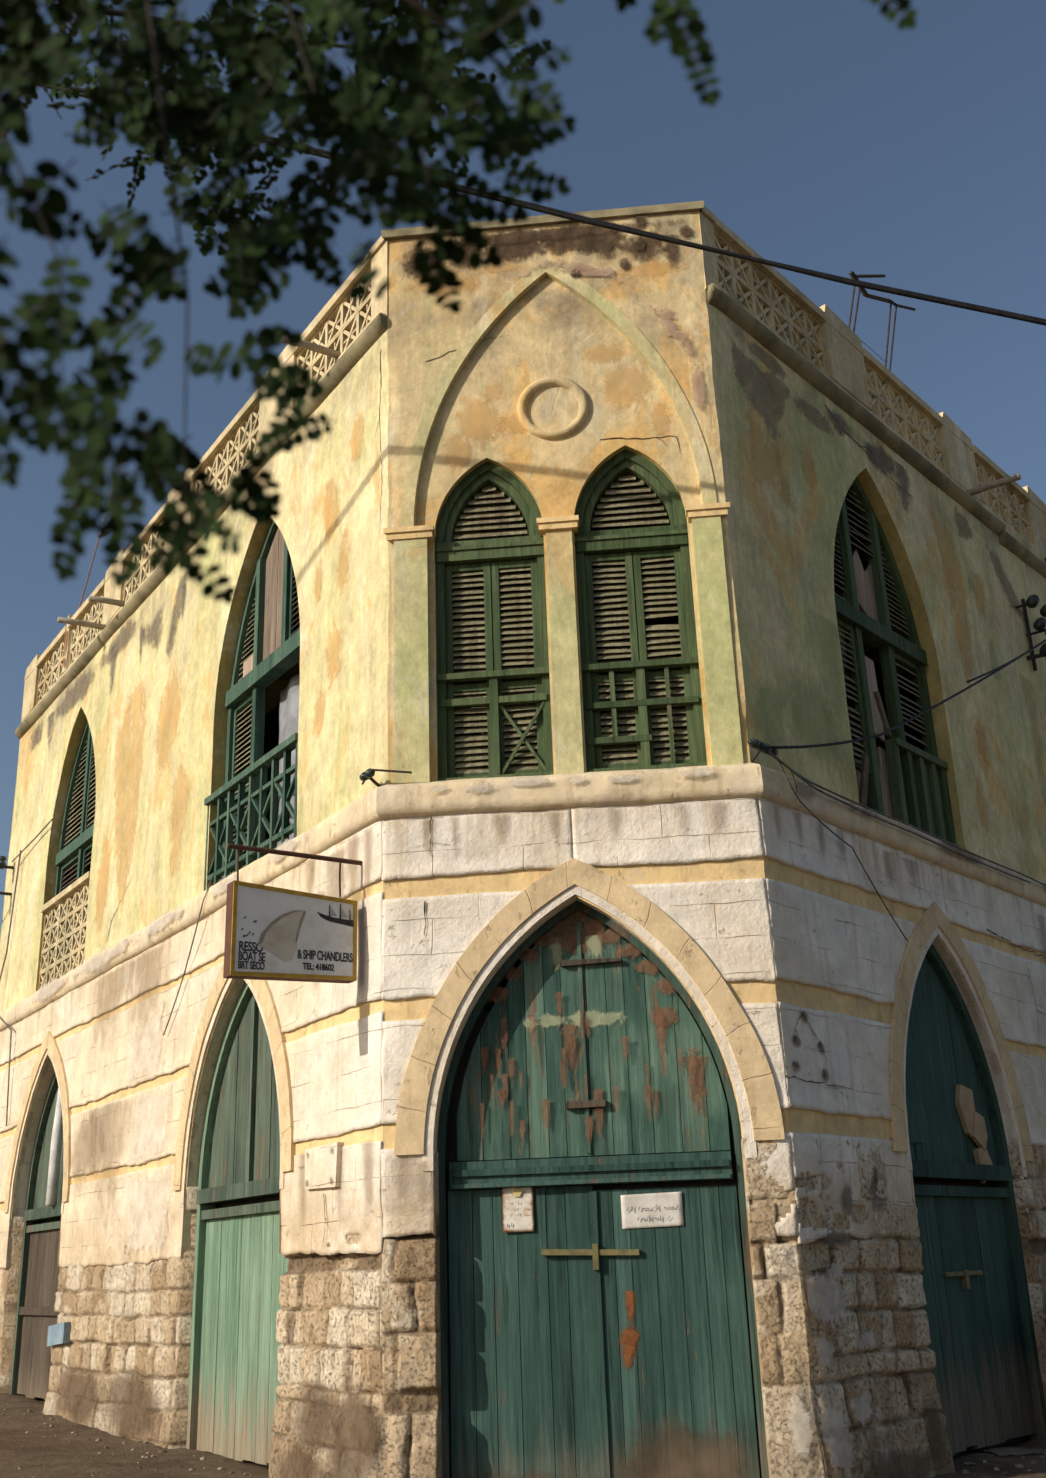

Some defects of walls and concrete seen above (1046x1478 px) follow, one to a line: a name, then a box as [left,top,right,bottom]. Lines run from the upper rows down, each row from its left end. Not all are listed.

water stain [403,221,679,279]
flaking render [751,1175,869,1233]
rust [619,1291,639,1368]
peeling [817,1339,834,1366]
peeling [788,1391,812,1456]
peeling [850,1396,872,1425]